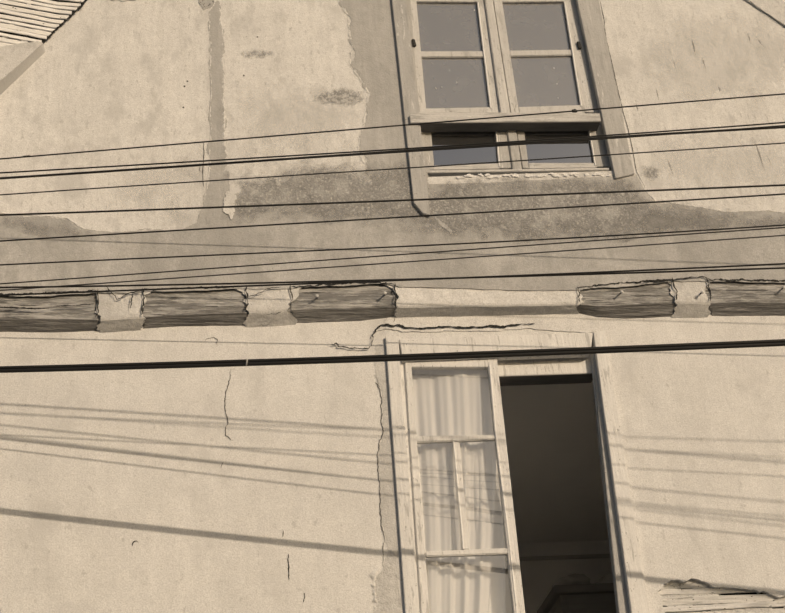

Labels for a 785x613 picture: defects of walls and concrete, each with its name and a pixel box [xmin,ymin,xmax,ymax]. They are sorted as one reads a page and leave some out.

crack [600,2,645,187]
peeling [0,0,785,333]
crack [331,306,535,349]
crack [223,370,231,440]
crack [374,375,385,560]
spalling [369,548,403,613]
spalling [658,580,785,613]